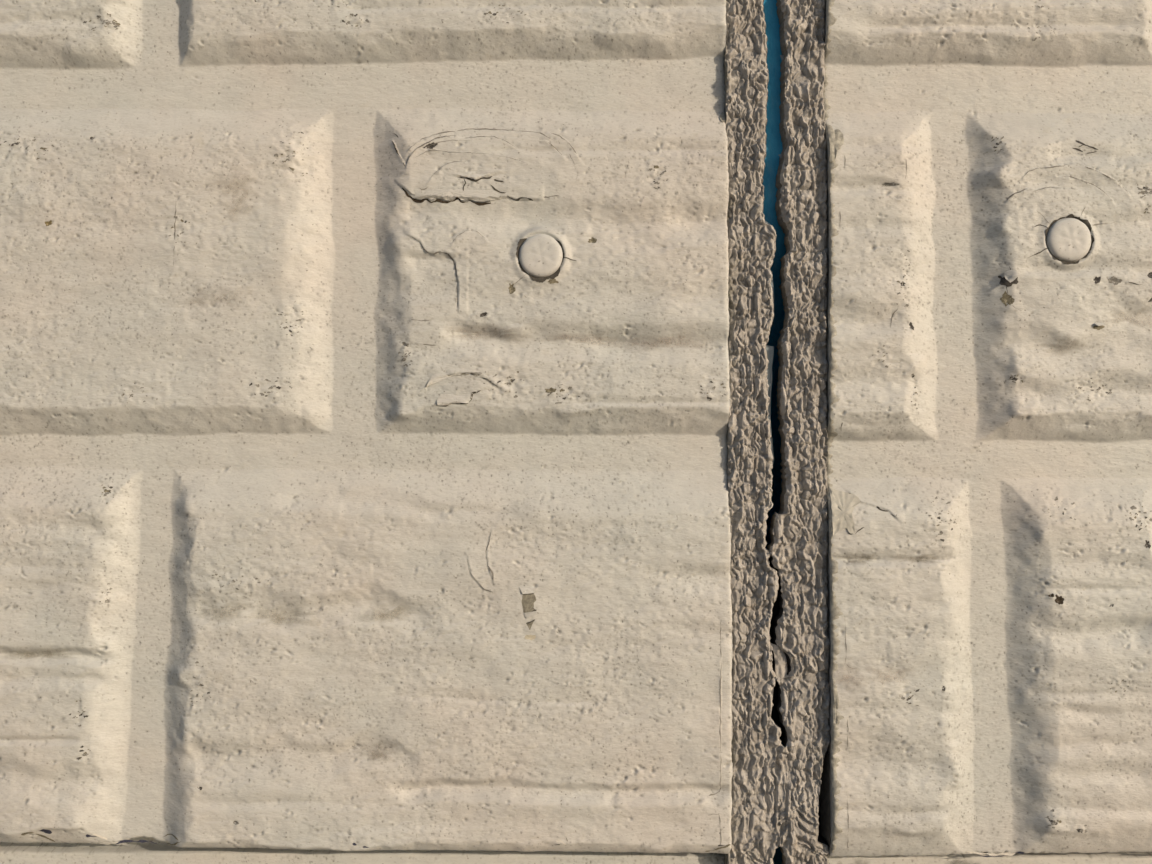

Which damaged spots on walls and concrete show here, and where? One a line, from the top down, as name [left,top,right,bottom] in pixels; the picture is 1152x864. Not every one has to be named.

peeling [402,173,558,206]
crack [761,0,791,746]
spalling [519,586,537,640]
crack [823,553,831,624]
crack [817,718,830,847]
crack [773,845,786,864]